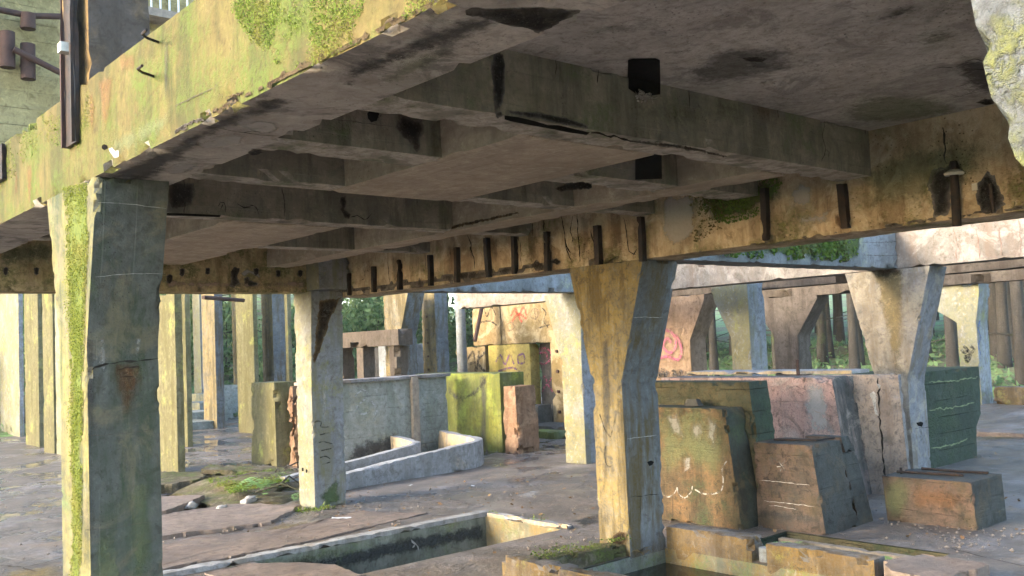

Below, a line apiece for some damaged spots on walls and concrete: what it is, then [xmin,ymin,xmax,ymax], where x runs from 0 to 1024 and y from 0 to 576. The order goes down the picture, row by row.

damp [695,52,784,80]
crack [591,132,633,142]
spalling [884,166,1024,228]
crack [518,216,593,265]
spalling [313,258,561,363]
crack [92,358,158,377]
crack [877,379,886,475]